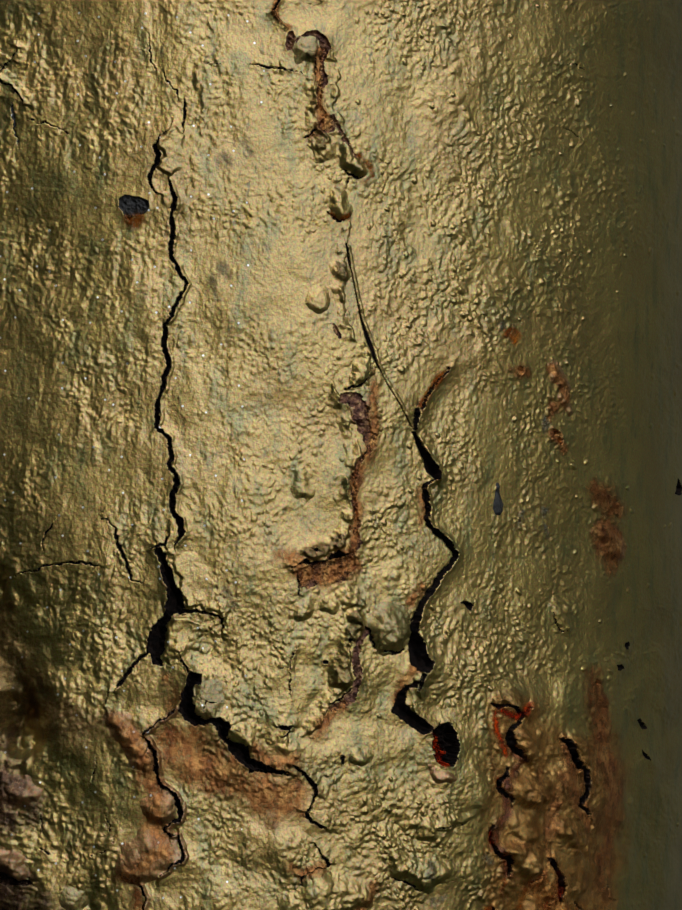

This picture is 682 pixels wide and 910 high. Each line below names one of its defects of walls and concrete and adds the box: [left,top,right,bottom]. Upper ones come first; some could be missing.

rust [271,0,292,30]
rust [310,47,332,138]
peeling [118,195,149,216]
crack [101,37,331,910]
rust [275,380,379,587]
crack [344,243,459,735]
crack [15,518,102,576]
crack [291,543,359,595]
crack [490,702,532,808]
rust [485,702,623,910]
crack [552,738,592,831]
crack [488,825,584,910]